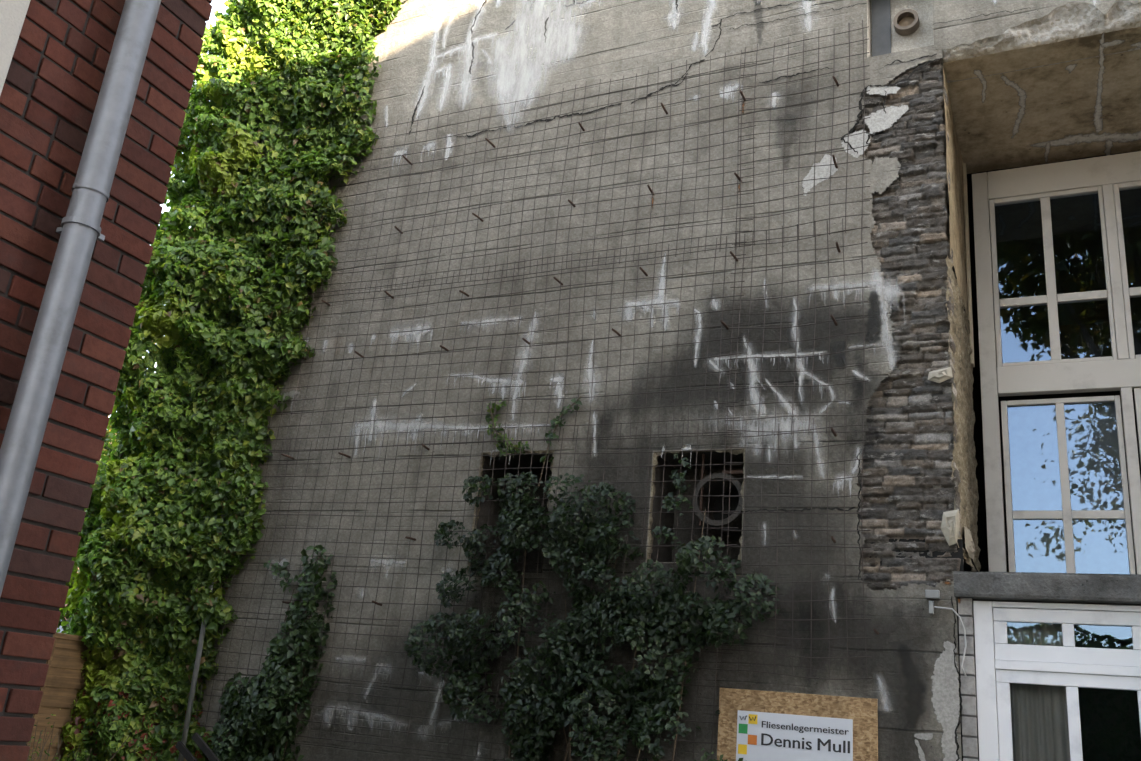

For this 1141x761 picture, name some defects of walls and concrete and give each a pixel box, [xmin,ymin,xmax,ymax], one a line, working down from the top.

leakage [693,0,715,54]
leakage [803,0,811,29]
crack [933,8,1027,25]
leakage [417,0,579,125]
crack [457,0,867,137]
crack [409,86,425,135]
spalling [802,0,1141,591]